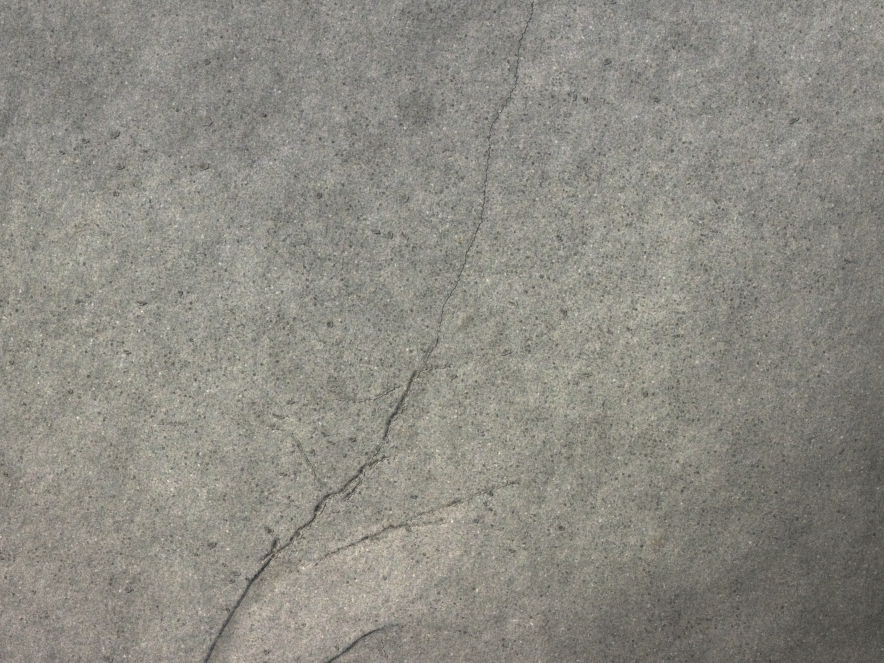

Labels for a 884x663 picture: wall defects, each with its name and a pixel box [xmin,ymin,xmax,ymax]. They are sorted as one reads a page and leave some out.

crack [244,0,533,591]
crack [328,628,392,663]